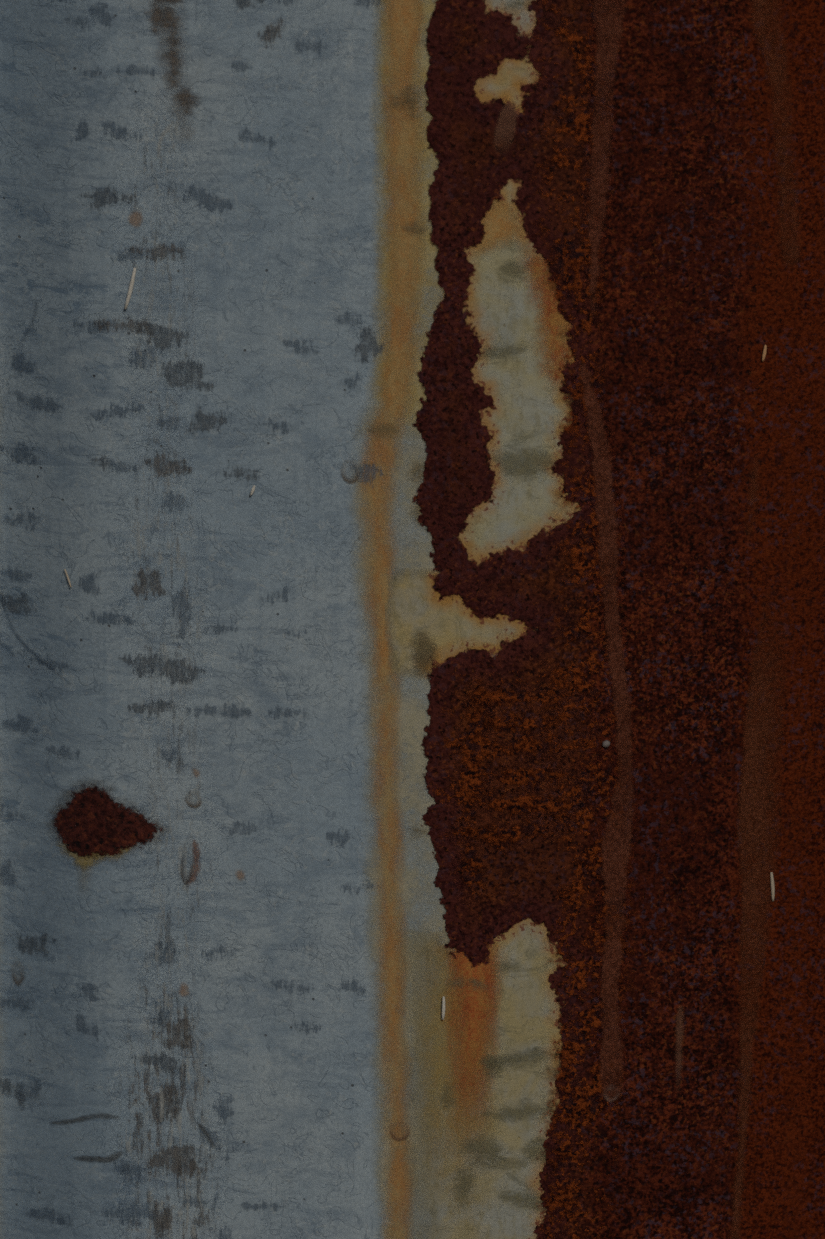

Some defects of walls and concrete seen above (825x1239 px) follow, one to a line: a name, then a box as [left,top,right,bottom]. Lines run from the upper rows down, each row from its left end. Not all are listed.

rust [51,785,162,867]
rust [355,0,825,1239]